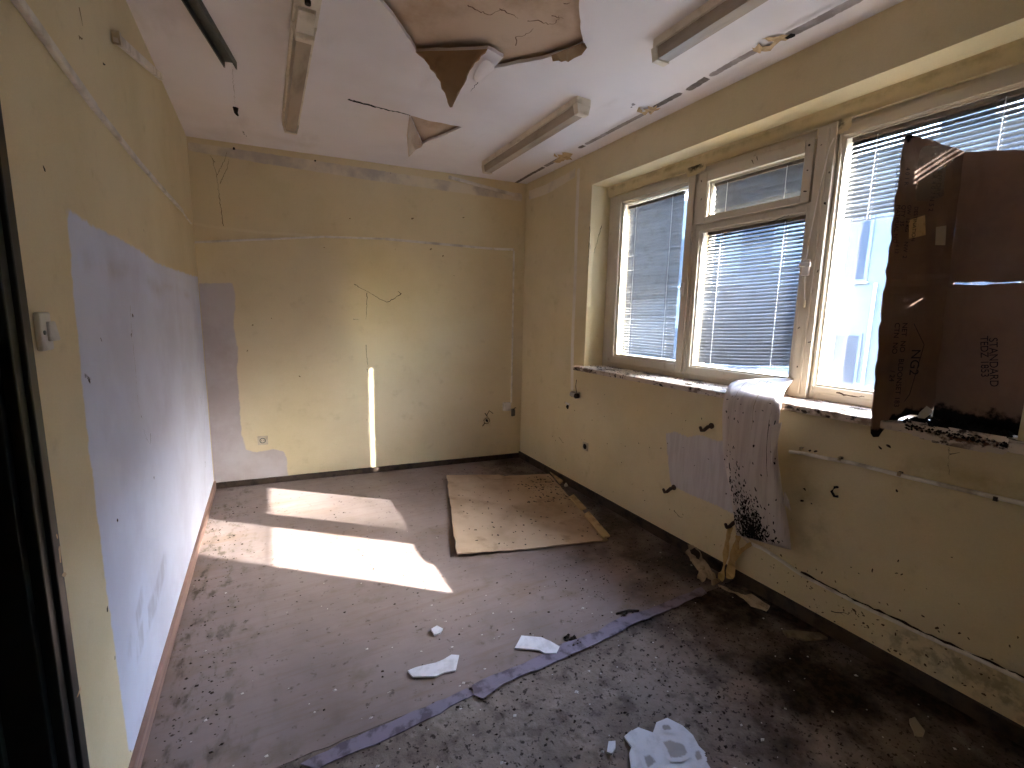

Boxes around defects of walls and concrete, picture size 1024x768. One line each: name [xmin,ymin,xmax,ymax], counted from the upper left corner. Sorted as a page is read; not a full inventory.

crack [348,99,409,119]
water stain [724,429,1024,727]